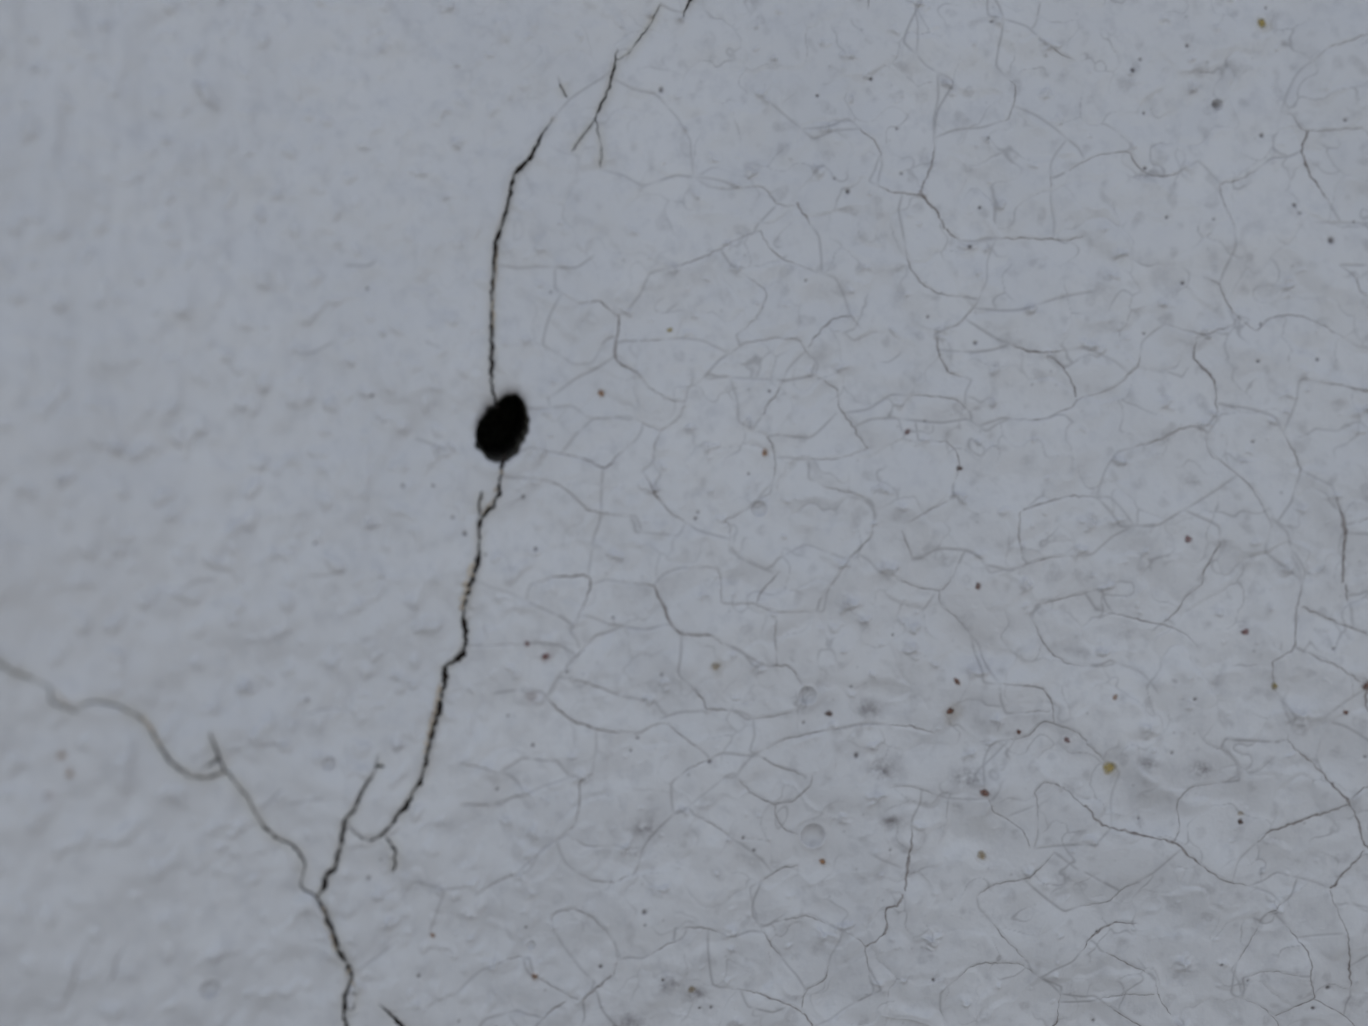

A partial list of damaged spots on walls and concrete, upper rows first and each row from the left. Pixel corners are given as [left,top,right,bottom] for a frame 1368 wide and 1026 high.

crack [489,0,692,409]
crack [880,138,959,239]
crack [536,293,695,523]
crack [1134,277,1345,531]
crack [637,584,727,645]
crack [671,186,963,881]
crack [1272,499,1368,711]
crack [496,574,707,1021]
crack [761,832,913,973]
crack [958,782,1248,978]
crack [1083,883,1170,1026]
crack [1240,734,1368,1025]